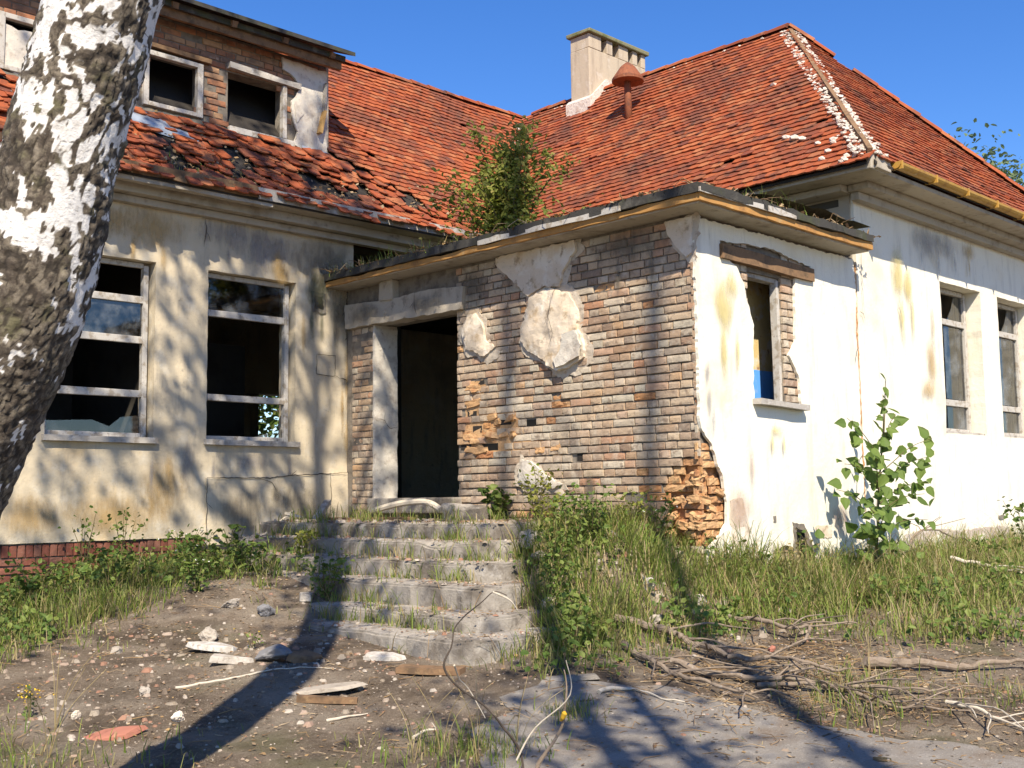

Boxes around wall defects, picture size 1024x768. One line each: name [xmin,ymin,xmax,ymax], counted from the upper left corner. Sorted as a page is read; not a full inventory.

flaking render [458,307,504,365]
flaking render [495,239,585,298]
flaking render [664,212,701,263]
water stain [717,280,739,363]
water stain [895,262,914,328]
spalling [461,378,574,496]
crack [206,470,349,539]
spalling [663,457,750,547]